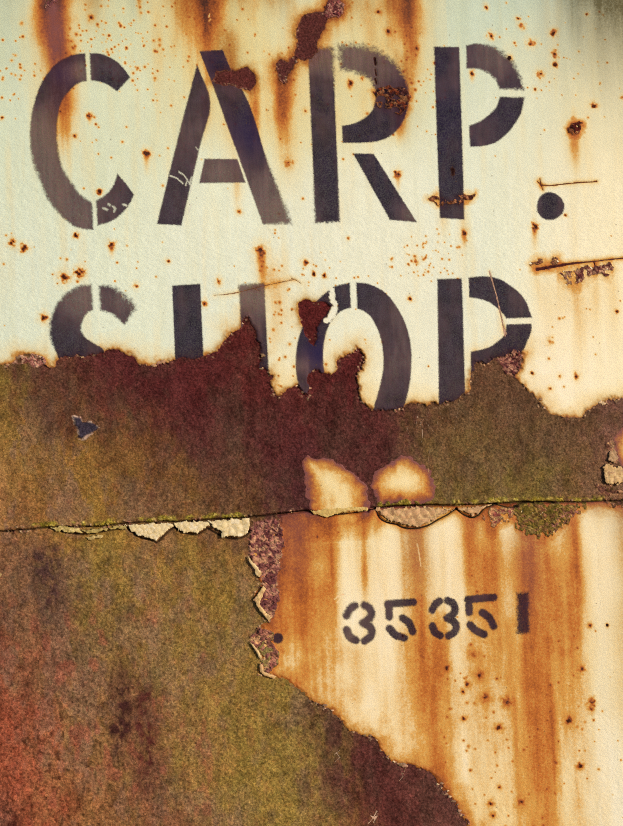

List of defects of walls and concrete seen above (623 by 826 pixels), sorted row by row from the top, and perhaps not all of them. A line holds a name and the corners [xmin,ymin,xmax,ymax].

rust [2,0,448,202]
rust [559,96,604,178]
rust [227,171,248,220]
peeling [282,284,343,361]
peeling [602,451,623,485]
peeling [51,518,250,541]
crack [0,494,623,549]
rust [0,218,623,826]
peeling [311,504,492,527]
peeling [248,556,272,621]
peeling [250,642,276,679]